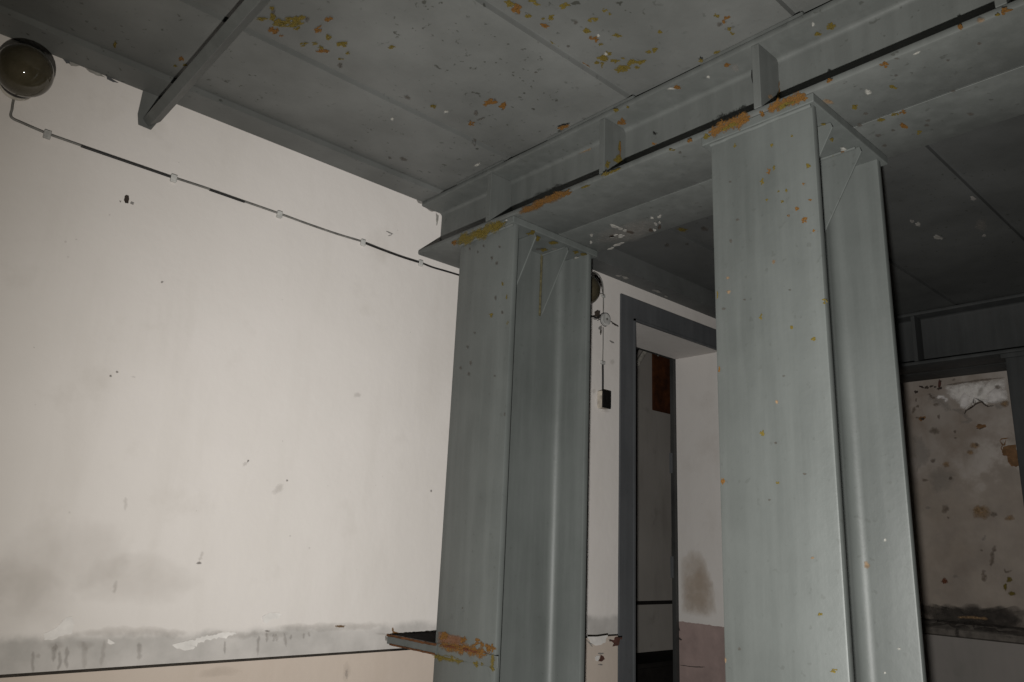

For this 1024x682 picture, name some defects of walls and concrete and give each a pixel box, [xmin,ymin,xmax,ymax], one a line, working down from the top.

rust [257,7,349,60]
rust [504,0,570,28]
rust [575,8,658,73]
rust [687,81,808,143]
rust [520,185,590,213]
rust [452,219,507,250]
peeling [913,379,1007,432]
damp [932,607,1018,636]
rust [386,628,496,671]